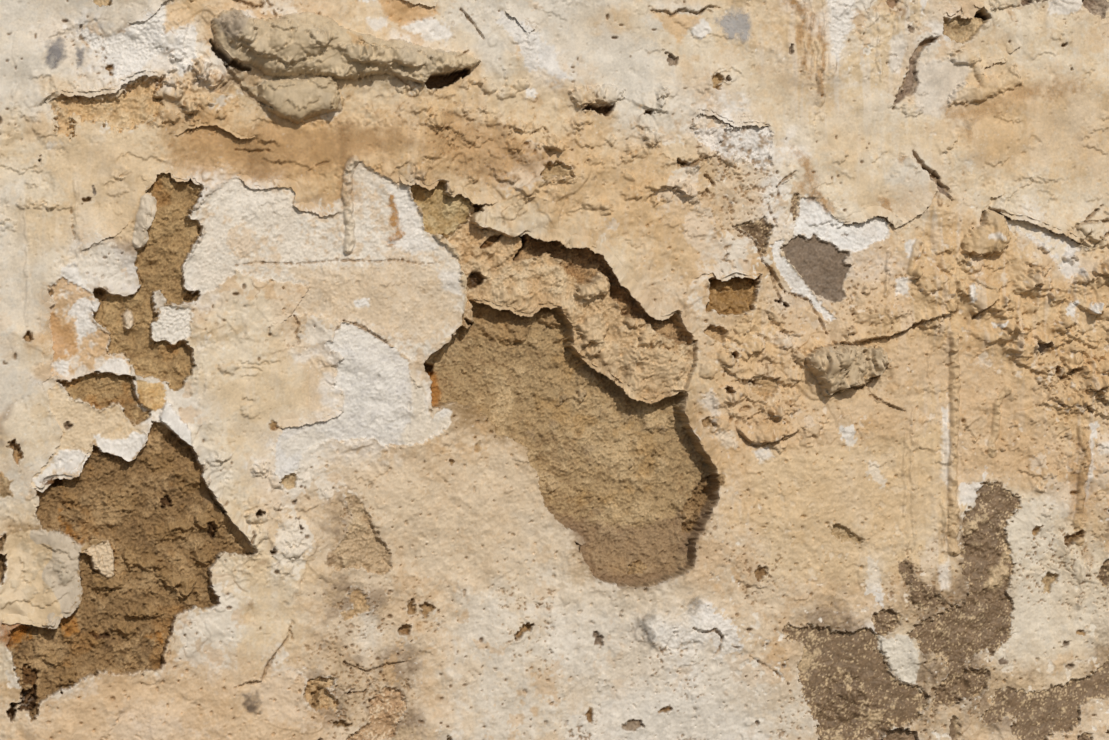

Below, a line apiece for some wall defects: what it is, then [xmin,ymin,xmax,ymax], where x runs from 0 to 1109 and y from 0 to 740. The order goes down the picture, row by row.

flaking render [1082,0,1109,20]
crack [892,36,939,110]
peeling [732,192,936,324]
flaking render [749,376,782,403]
flaking render [0,160,763,725]
peeling [752,565,771,583]
flaking render [782,481,1109,740]